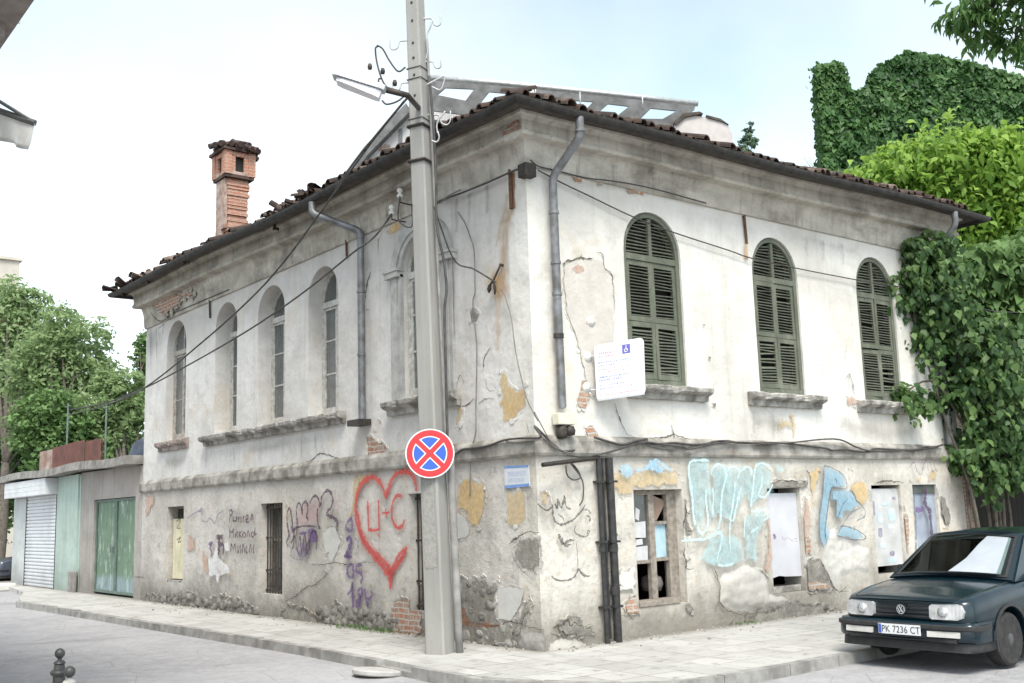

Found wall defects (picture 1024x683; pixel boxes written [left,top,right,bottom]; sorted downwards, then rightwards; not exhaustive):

flaking render [561,257,615,412]
peeling [498,370,529,425]
flaking render [365,418,389,454]
peeling [456,477,487,531]
peeling [602,467,694,539]
peeling [848,468,867,507]
flaking render [504,487,544,576]
crack [286,561,371,601]
flaking render [807,581,829,592]
flaking render [388,595,424,635]